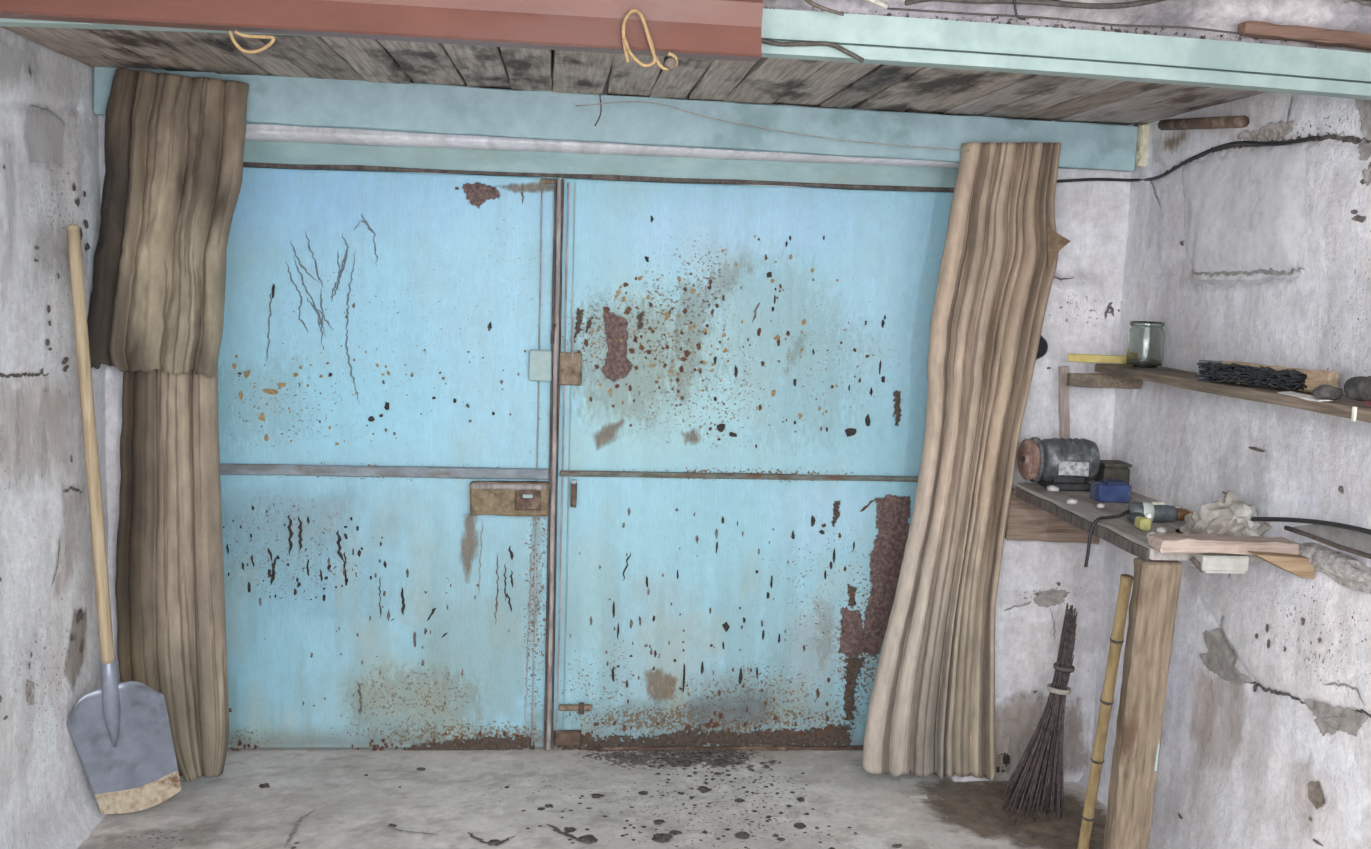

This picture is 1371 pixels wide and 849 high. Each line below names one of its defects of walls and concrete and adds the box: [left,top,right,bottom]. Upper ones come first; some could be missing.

crack [1150,95,1371,207]
flaking render [1355,99,1371,186]
corrosion [455,182,553,208]
flaking render [1351,210,1366,223]
crack [0,371,49,379]
corrosion [574,272,806,447]
corrosion [893,390,902,426]
corrosion [247,517,390,621]
corrosion [351,515,535,751]
corrosion [554,494,911,750]
hole [1308,781,1325,821]